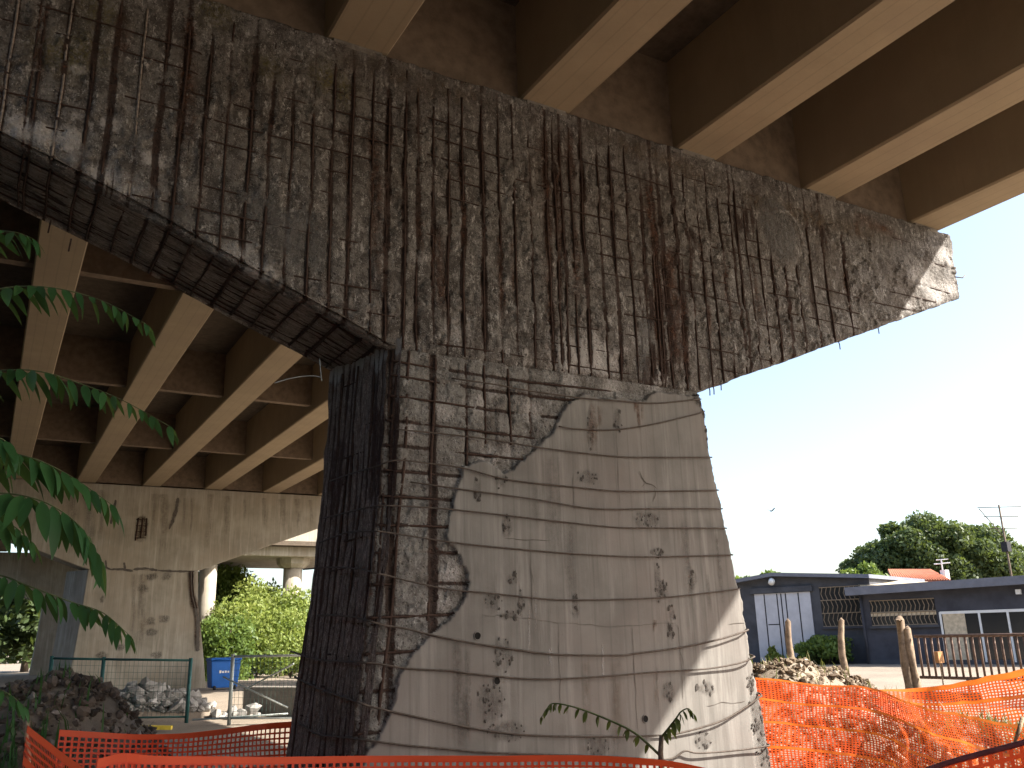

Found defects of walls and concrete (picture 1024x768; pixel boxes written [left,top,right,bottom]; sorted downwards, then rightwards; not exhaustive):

rust [543,137,584,294]
spalling [0,142,384,371]
spalling [387,506,452,541]
spalling [377,575,466,633]
peeling [485,570,525,621]
spalling [351,740,374,756]